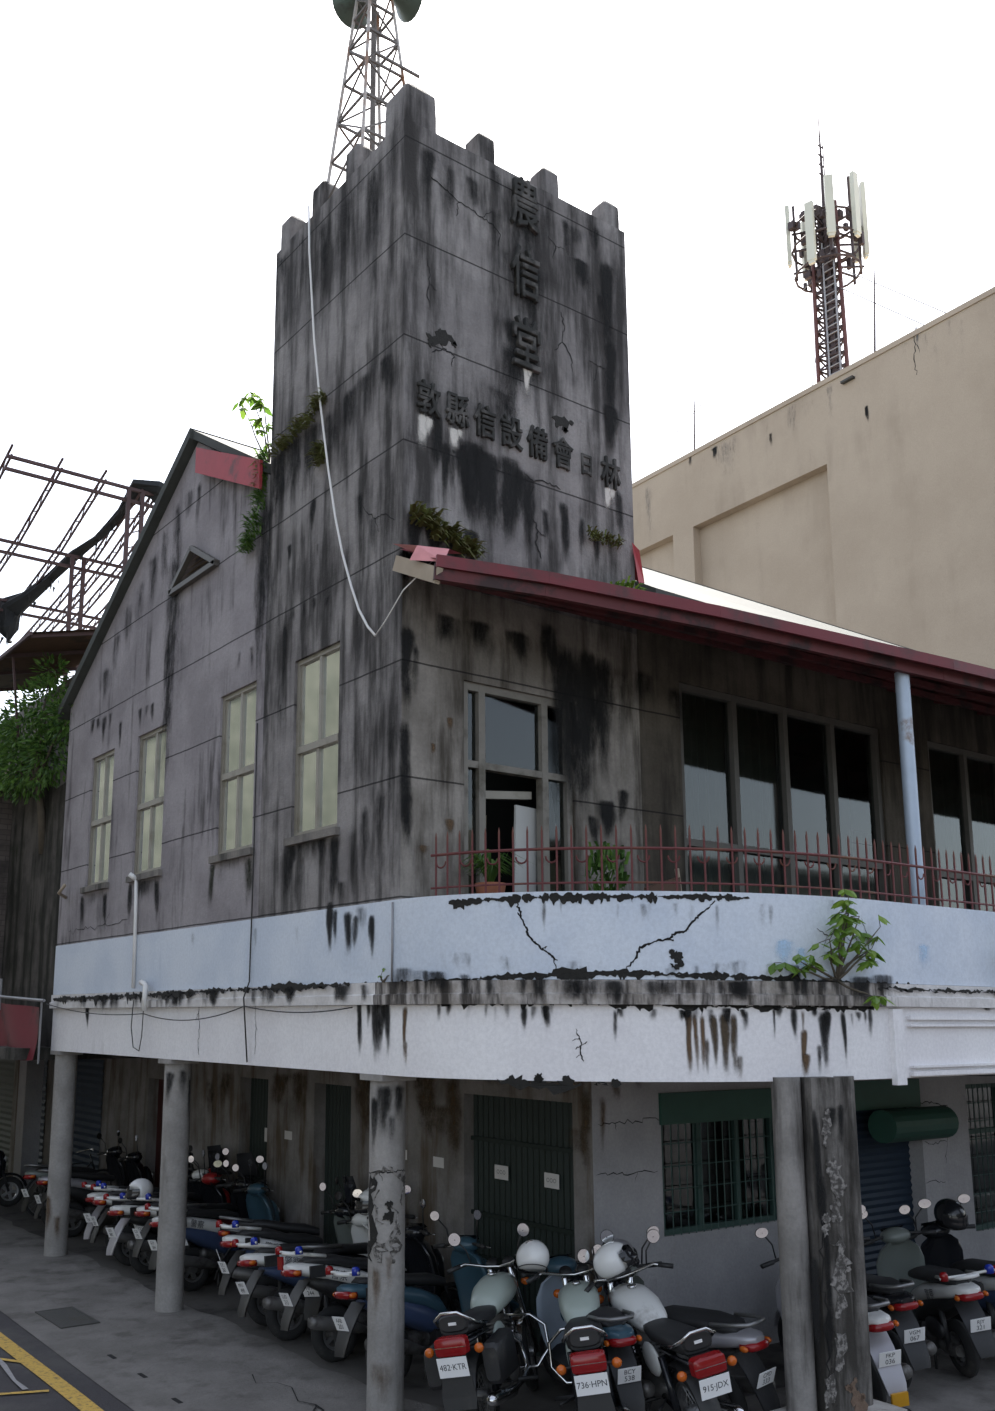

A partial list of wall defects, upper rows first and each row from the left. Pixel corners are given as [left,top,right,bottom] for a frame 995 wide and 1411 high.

leakage [563,222,618,442]
leakage [256,356,393,630]
leakage [399,414,599,581]
leakage [401,628,418,699]
leakage [389,724,412,838]
leakage [507,625,628,841]
leakage [284,837,374,950]
crack [516,903,558,969]
crack [626,900,715,968]
leakage [53,981,390,1048]
leakage [395,941,995,1068]
peeling [820,1109,868,1411]